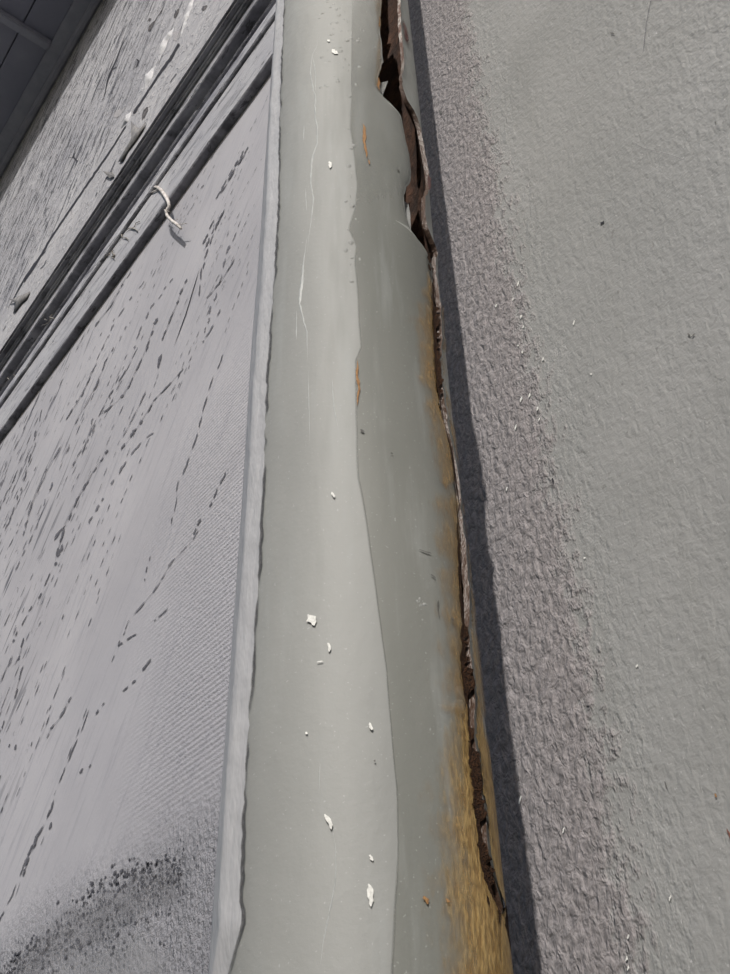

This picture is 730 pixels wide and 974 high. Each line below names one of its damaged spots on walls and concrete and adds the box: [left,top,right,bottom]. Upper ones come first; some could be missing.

crack [378,81,388,96]
crack [403,202,411,229]
rust [426,278,458,485]
crack [427,251,512,953]
rust [446,497,513,974]
mould [0,838,199,974]